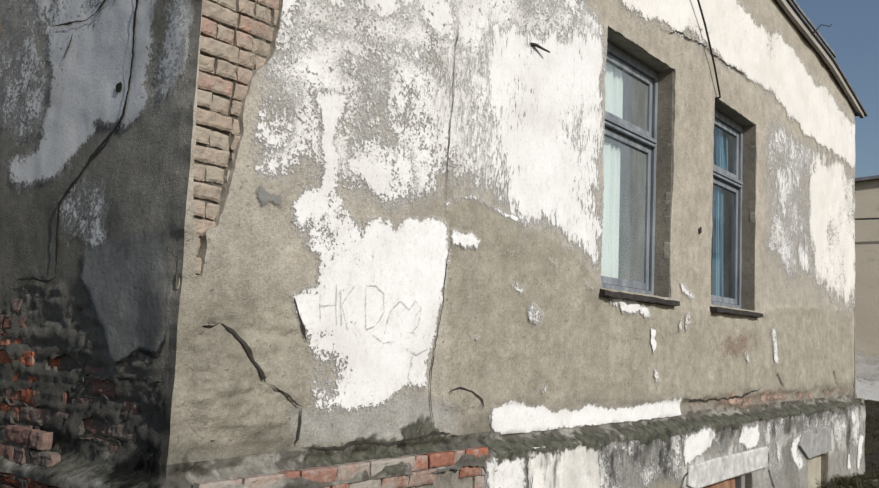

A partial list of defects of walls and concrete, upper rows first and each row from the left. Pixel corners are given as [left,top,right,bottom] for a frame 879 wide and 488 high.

crack [17,0,138,283]
peeling [0,0,607,413]
crack [446,10,459,209]
flaking render [0,298,94,488]
flaking render [84,401,140,454]
damp [104,438,162,488]
crack [202,243,485,450]
flaking render [193,376,879,488]
peeling [609,298,657,352]
peeling [771,328,779,364]